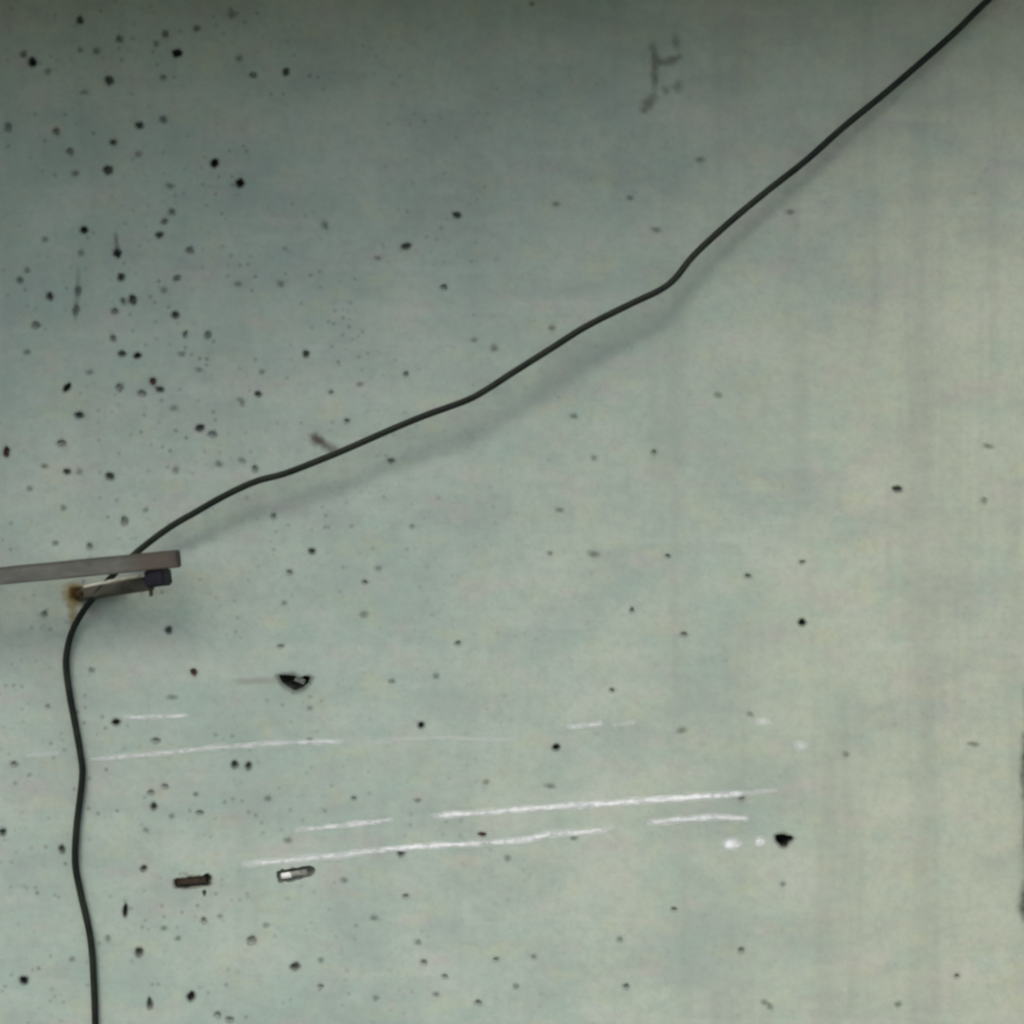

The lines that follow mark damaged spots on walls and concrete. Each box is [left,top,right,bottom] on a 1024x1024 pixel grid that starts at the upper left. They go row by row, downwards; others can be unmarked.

spalling [279,674,310,690]